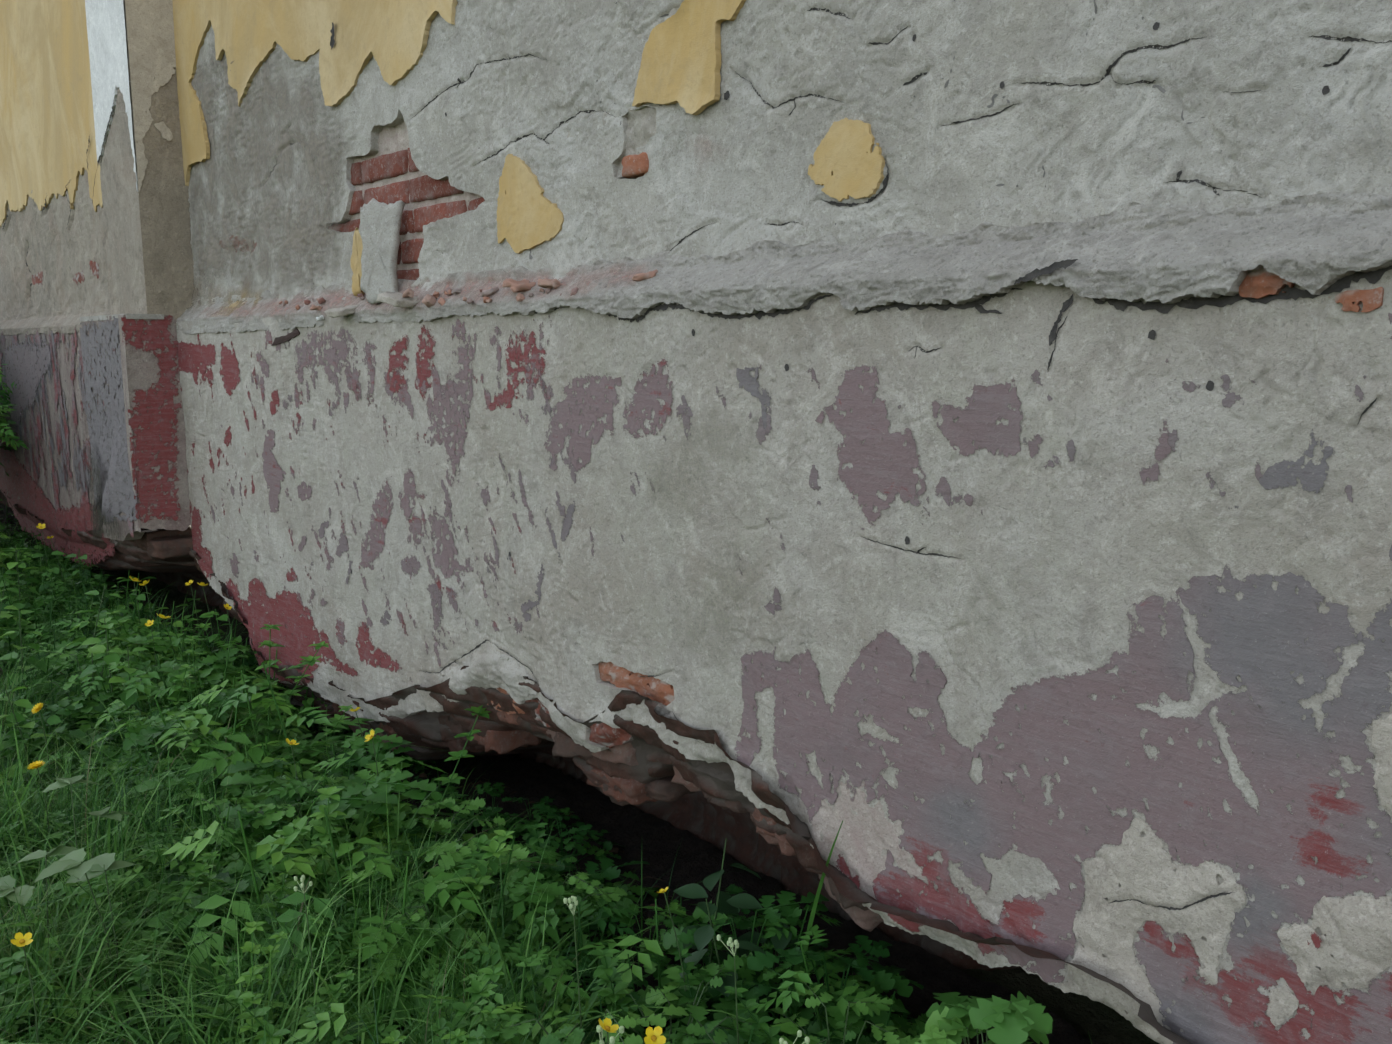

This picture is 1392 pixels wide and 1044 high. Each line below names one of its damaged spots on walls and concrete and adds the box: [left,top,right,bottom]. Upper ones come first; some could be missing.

crack [392,14,547,116]
crack [807,7,908,45]
crack [942,0,1205,132]
crack [1309,35,1391,67]
crack [477,80,621,164]
crack [670,162,889,251]
crack [1167,170,1262,198]
peeling [0,0,1392,685]
crack [606,259,1392,369]
crack [861,536,961,559]
peeling [735,565,1392,1044]
crack [1110,891,1237,910]